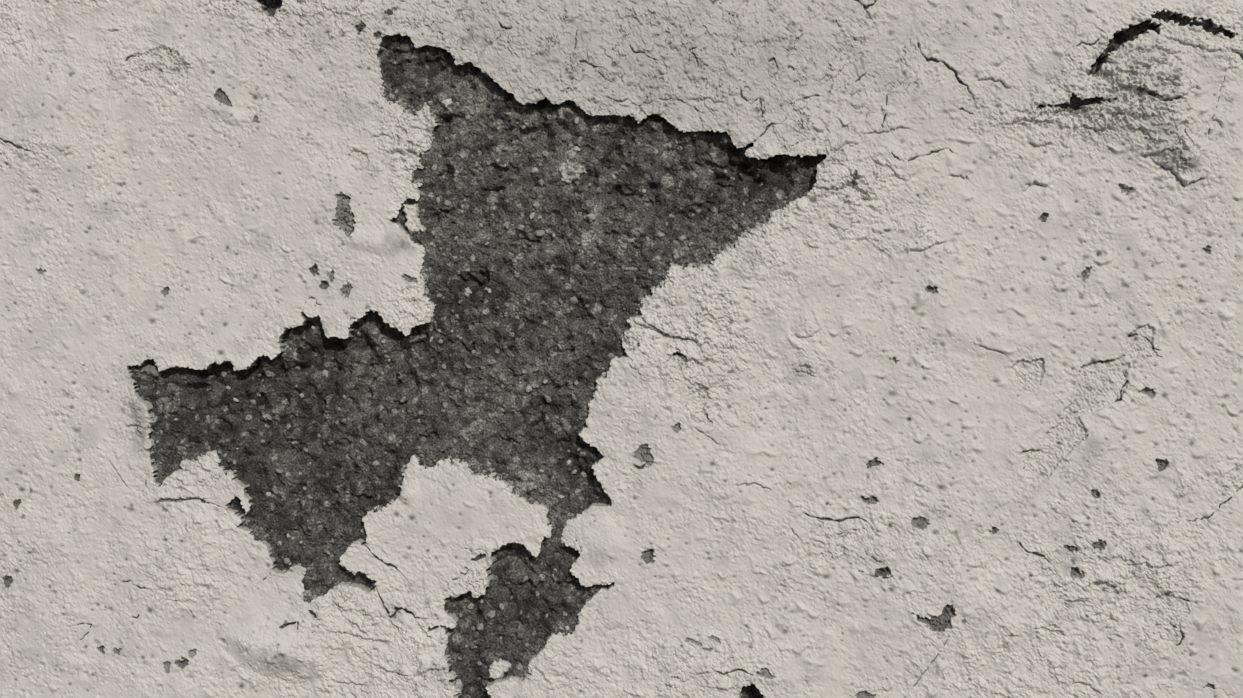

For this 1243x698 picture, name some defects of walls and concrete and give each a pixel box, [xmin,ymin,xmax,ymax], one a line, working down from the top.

peeling [123,21,827,698]
crack [1038,9,1243,144]